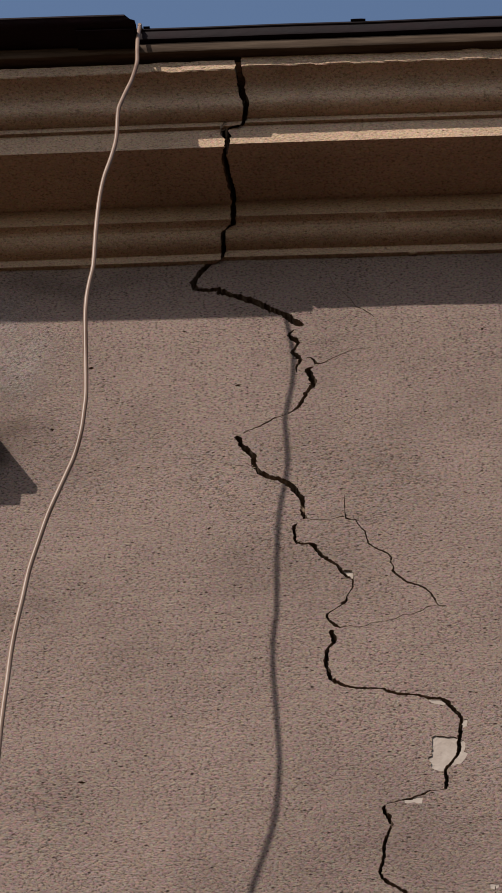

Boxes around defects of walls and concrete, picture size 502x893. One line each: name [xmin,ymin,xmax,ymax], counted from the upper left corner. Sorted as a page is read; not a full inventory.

crack [190,66,464,893]
peeling [428,735,468,771]